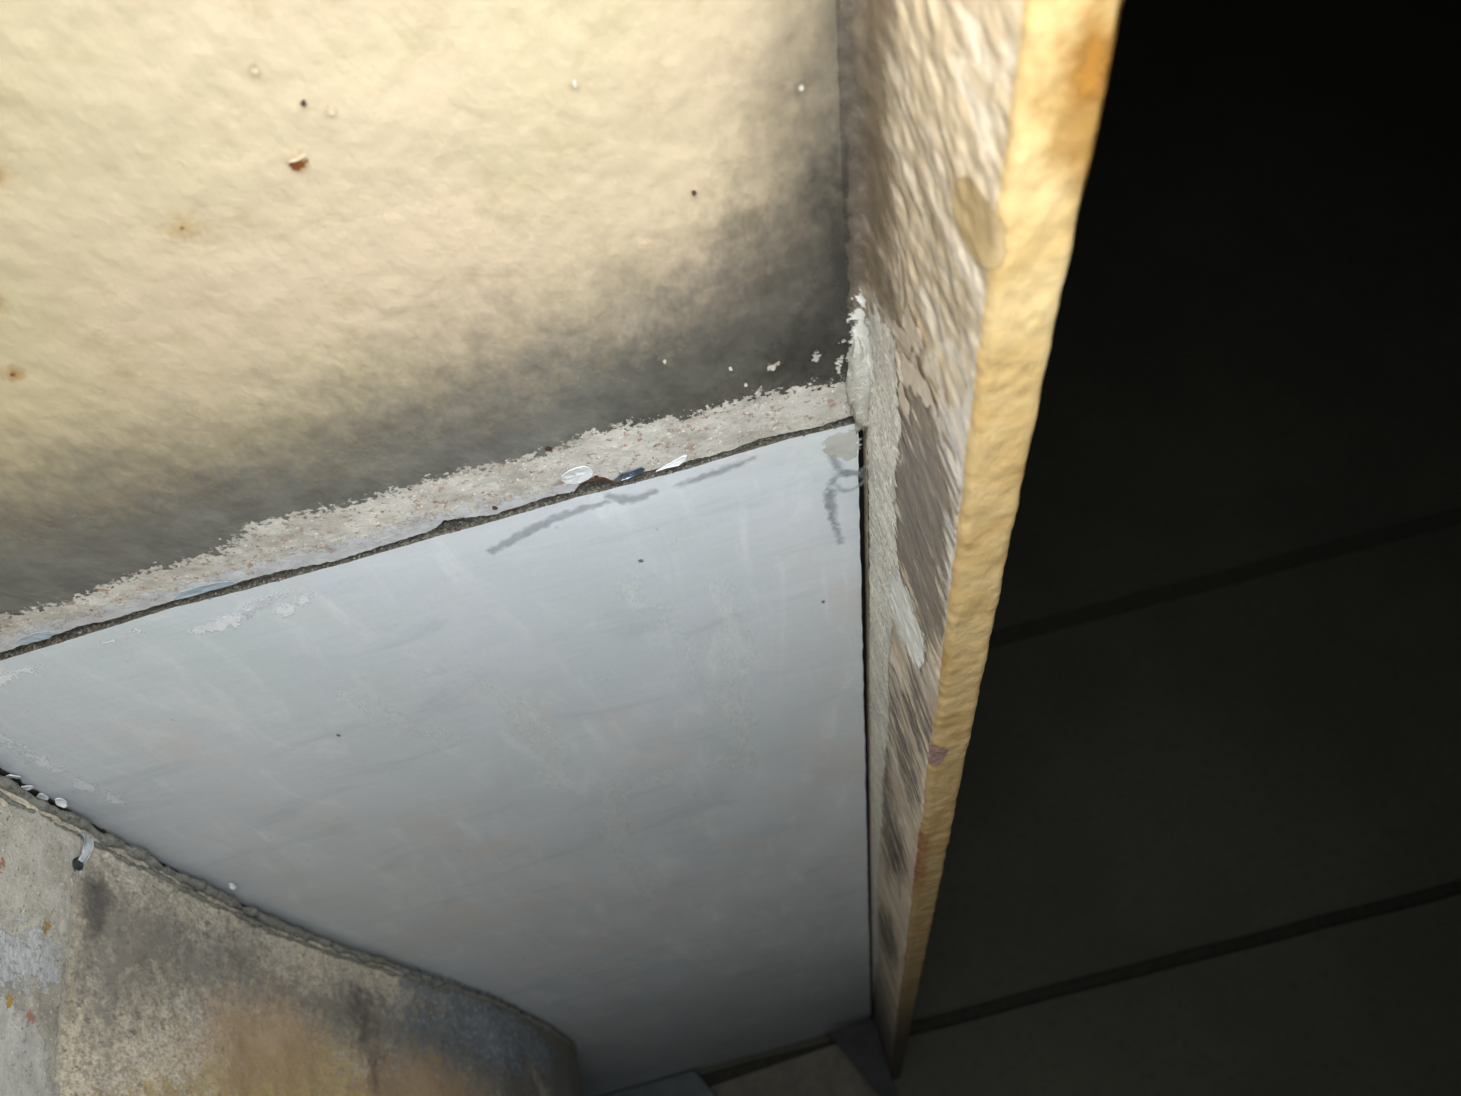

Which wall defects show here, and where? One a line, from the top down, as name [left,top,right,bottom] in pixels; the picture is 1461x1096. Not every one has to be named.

rust [289,159,308,171]
damp [776,207,856,378]
peeling [812,289,926,999]